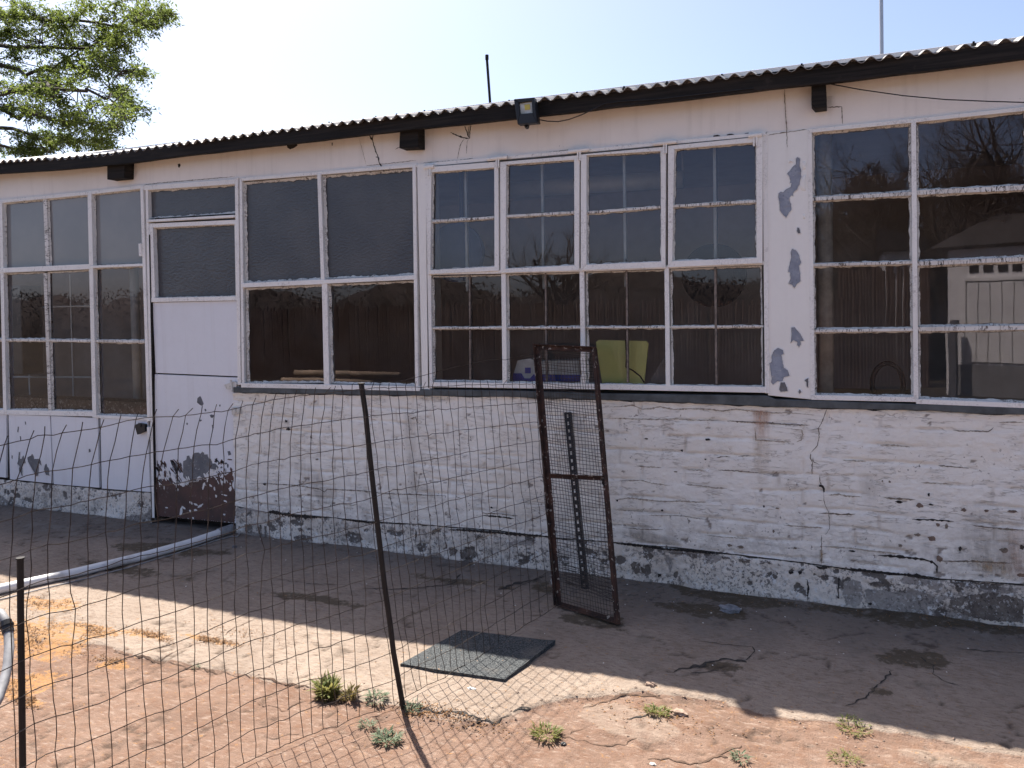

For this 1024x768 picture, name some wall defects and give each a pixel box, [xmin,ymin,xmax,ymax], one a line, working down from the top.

crack [770,90,807,136]
peeling [777,156,803,219]
peeling [787,248,802,289]
peeling [769,326,809,394]
peeling [17,451,50,477]
peeling [156,451,274,540]
crack [613,405,1023,600]
flaking render [630,530,771,577]
flaking render [842,579,920,621]
flaking render [950,582,1024,623]
crack [674,641,755,673]
crack [846,670,892,706]